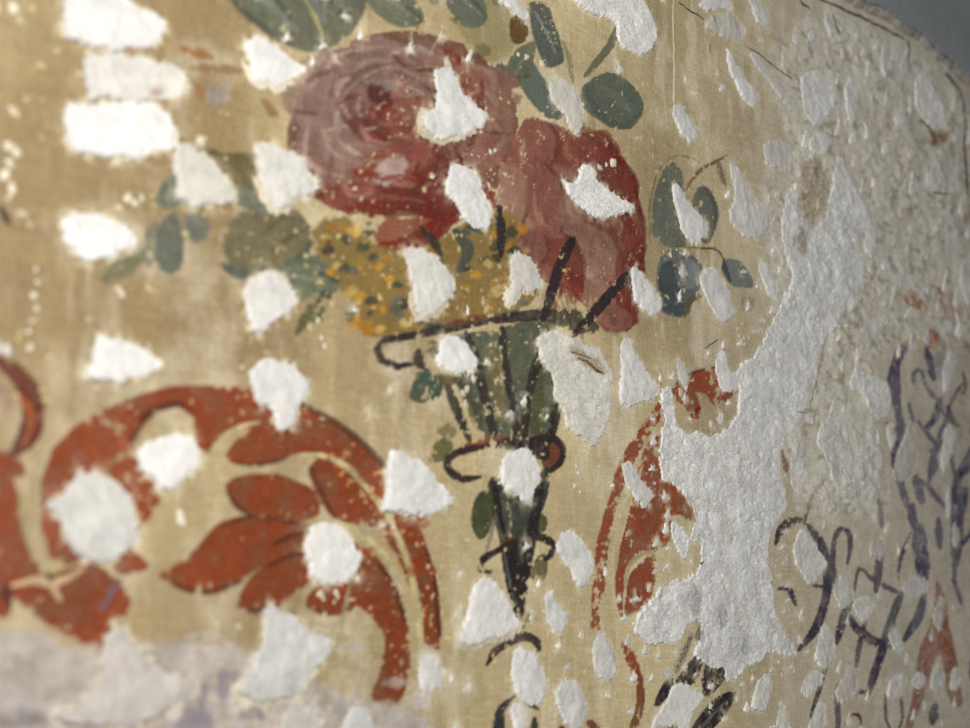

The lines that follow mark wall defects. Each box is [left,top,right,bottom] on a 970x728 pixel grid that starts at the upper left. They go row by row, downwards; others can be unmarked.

flaking render [62,0,235,209]
flaking render [416,58,488,146]
flaking render [249,357,310,432]
flaking render [536,0,970,728]
flaking render [45,471,140,566]
flaking render [136,433,201,492]
flaking render [303,521,361,586]
flaking render [380,449,454,529]
flaking render [231,605,332,728]
flaking render [454,577,588,728]
flaking render [343,706,373,728]